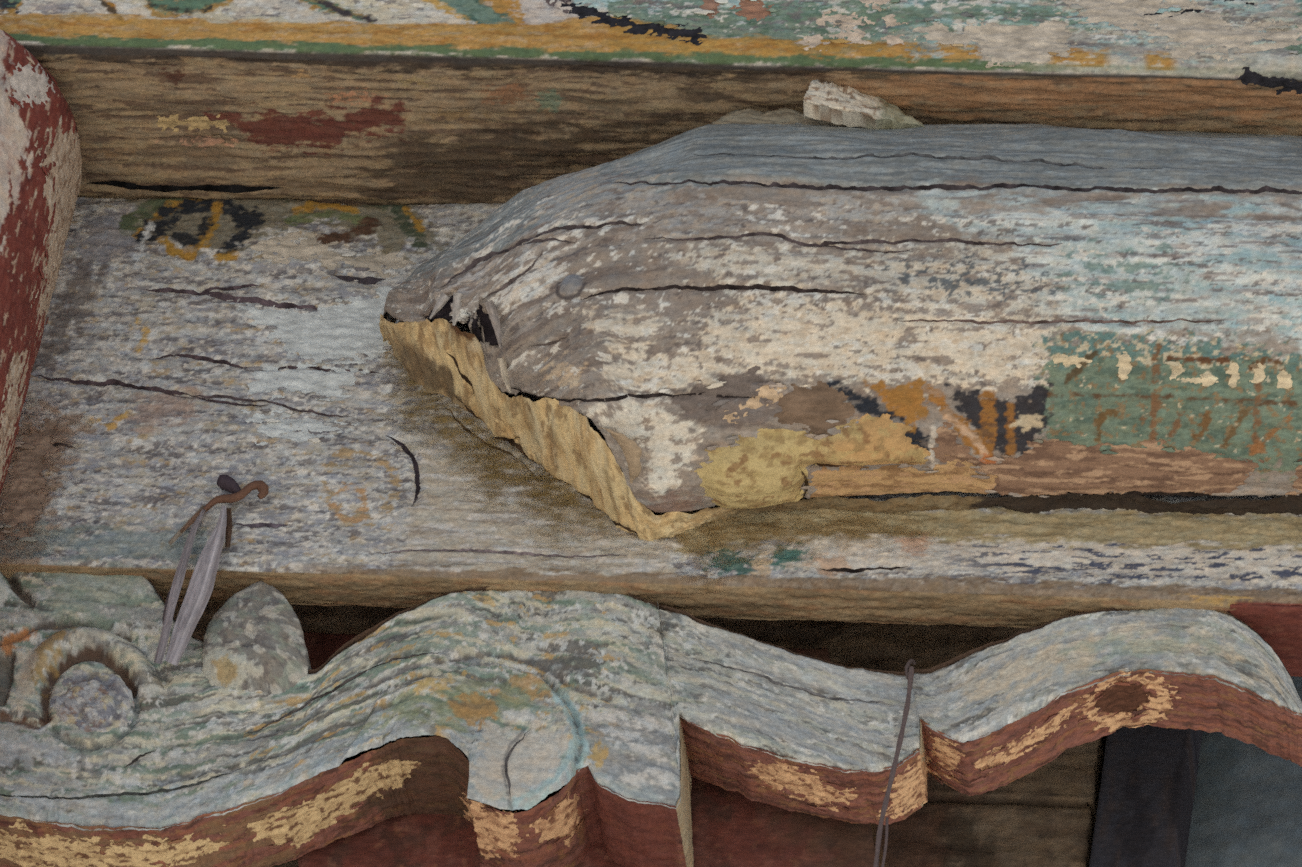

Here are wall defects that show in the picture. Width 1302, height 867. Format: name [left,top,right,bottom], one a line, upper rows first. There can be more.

peeling [794,0,1302,68]
crack [613,152,1302,194]
crack [439,220,1062,300]
peeling [0,115,82,495]
crack [901,317,1217,325]
crack [36,354,384,417]
crack [513,388,756,403]
crack [375,353,637,558]
peeling [658,365,1264,509]
peeling [0,819,230,867]
peeling [245,759,421,849]
peeling [459,789,587,860]